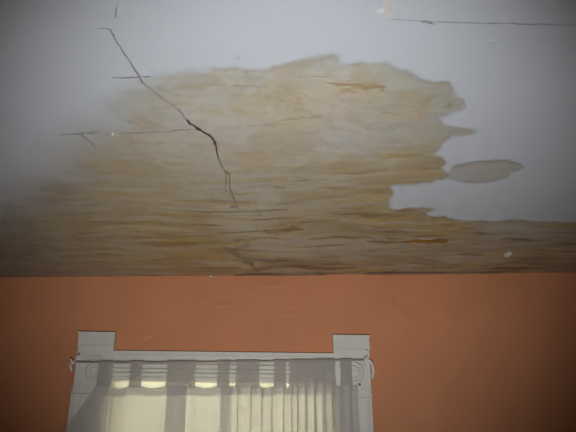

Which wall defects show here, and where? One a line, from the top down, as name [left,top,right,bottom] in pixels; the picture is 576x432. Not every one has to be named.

crack [62,7,239,208]
leakage [0,55,576,277]
crack [392,18,558,26]